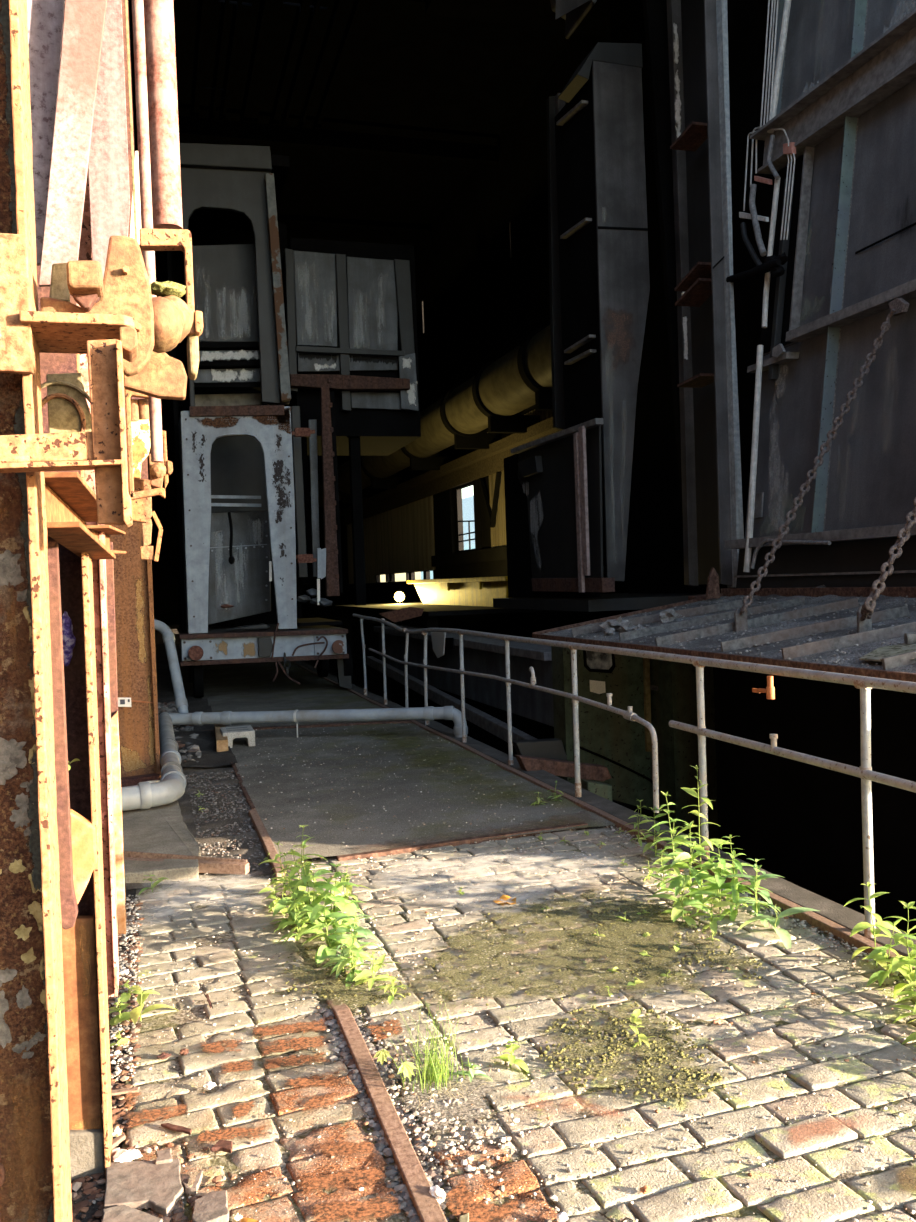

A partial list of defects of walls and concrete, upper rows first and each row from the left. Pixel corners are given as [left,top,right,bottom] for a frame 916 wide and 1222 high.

rust [195,406,292,434]
rust [121,576,155,772]
peeling [0,737,36,837]
rust [14,1082,42,1222]